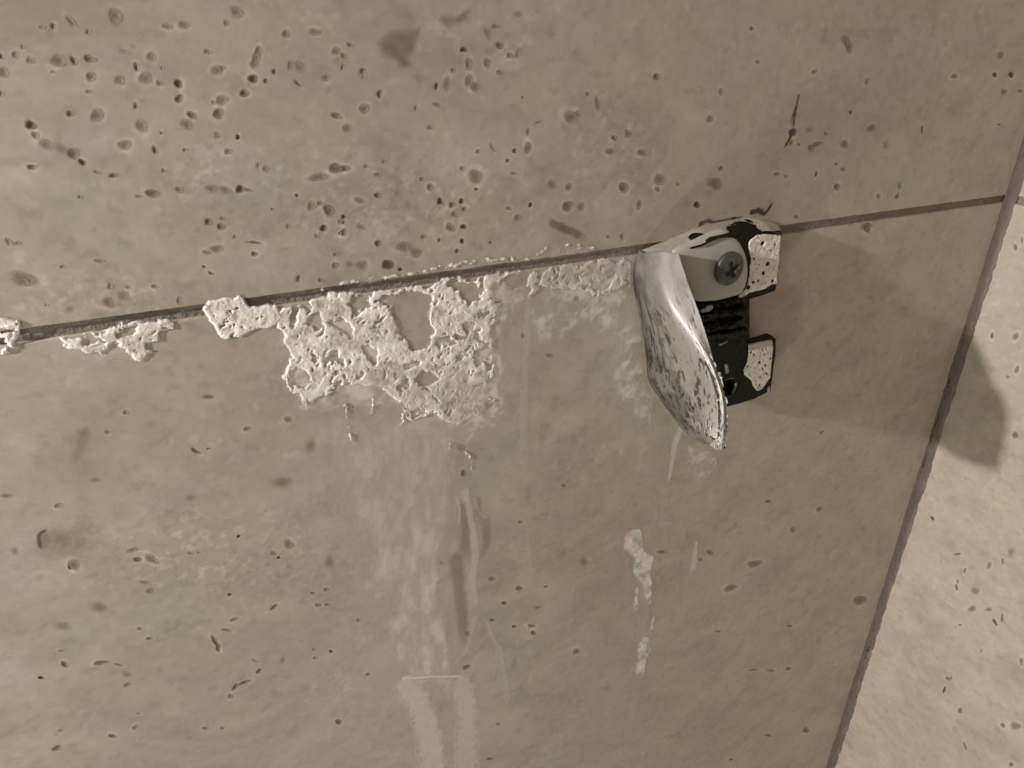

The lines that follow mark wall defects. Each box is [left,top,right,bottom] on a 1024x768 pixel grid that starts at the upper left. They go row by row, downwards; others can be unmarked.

spalling [50,55,96,94]
spalling [134,53,183,102]
spalling [240,46,303,97]
spalling [435,47,502,91]
spalling [26,121,52,150]
spalling [68,149,118,178]
spalling [310,164,350,181]
spalling [295,193,346,239]
spalling [420,177,467,253]
spalling [12,272,36,286]
spalling [383,260,415,279]
leakage [333,416,479,768]